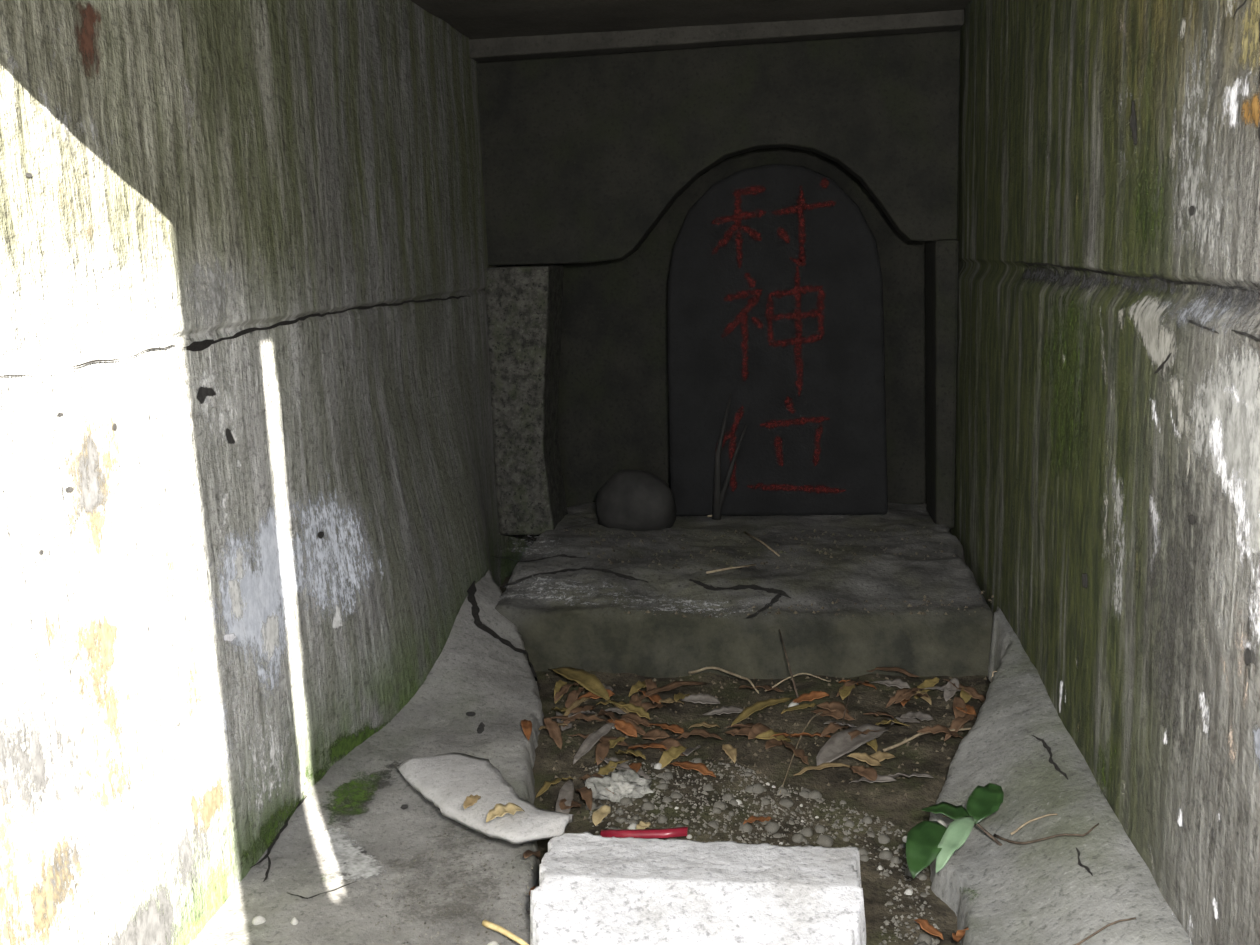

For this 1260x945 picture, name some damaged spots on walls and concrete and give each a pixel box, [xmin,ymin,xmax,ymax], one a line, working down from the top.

rust [75,4,101,76]
rust [1242,95,1260,126]
crack [72,296,465,367]
crack [1015,261,1260,341]
water stain [201,358,237,445]
peeling [1119,295,1192,475]
water stain [211,494,382,810]
crack [467,554,648,691]
crack [689,579,791,618]
water stain [1104,345,1260,774]
crack [1032,735,1068,780]
crack [1076,848,1093,876]